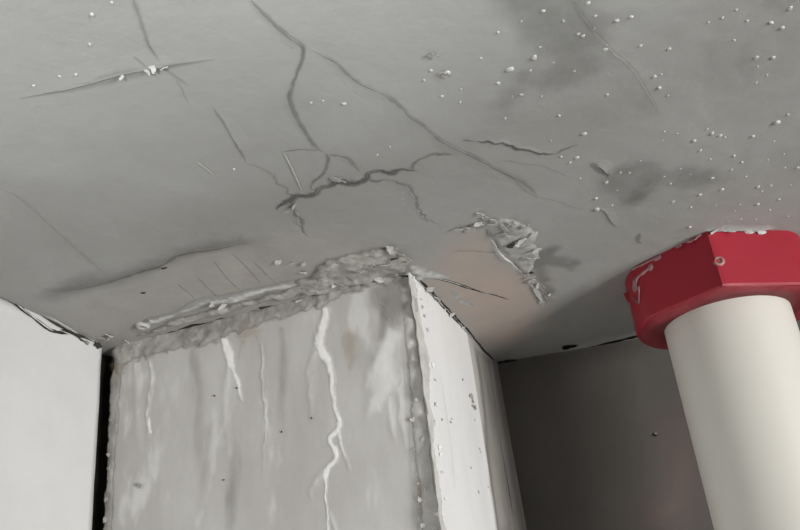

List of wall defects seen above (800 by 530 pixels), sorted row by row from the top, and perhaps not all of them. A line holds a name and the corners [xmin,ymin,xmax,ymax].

crack [134,0,168,76]
crack [564,0,660,115]
crack [247,0,578,237]
crack [589,159,617,178]
crack [2,298,94,342]
water stain [129,358,156,455]
water stain [218,336,247,507]
water stain [303,305,352,530]
water stain [356,296,418,453]
flaking render [274,206,584,530]
crack [414,275,493,360]